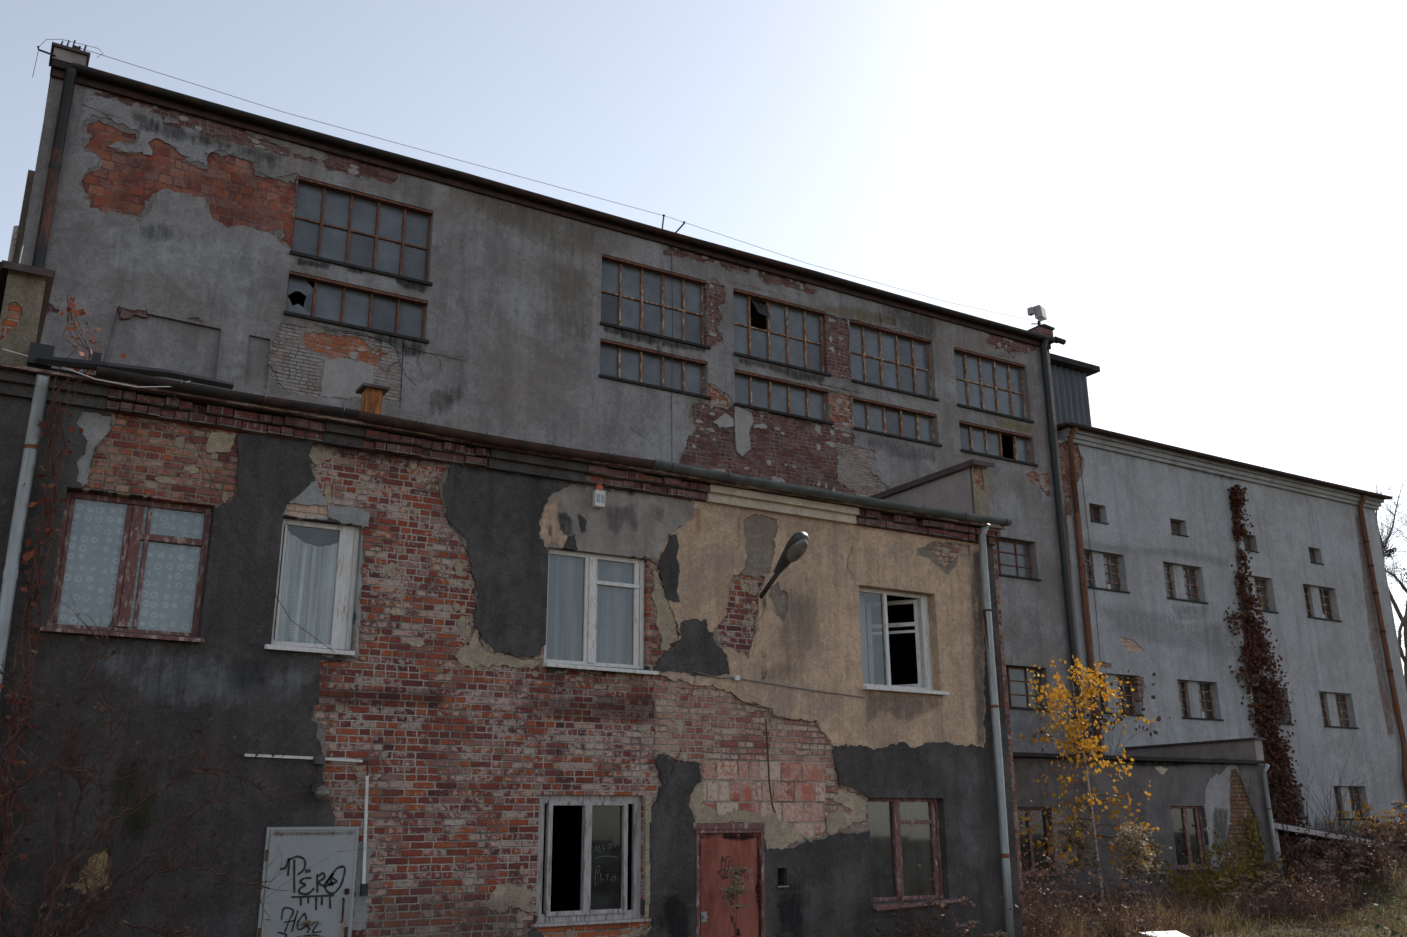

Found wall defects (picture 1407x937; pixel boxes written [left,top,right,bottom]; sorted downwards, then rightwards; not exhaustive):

flaking render [79,91,402,249]
flaking render [662,246,817,348]
flaking render [268,321,403,405]
flaking render [679,314,889,497]
flaking render [77,411,238,509]
flaking render [283,444,869,937]
flaking render [1200,765,1240,871]